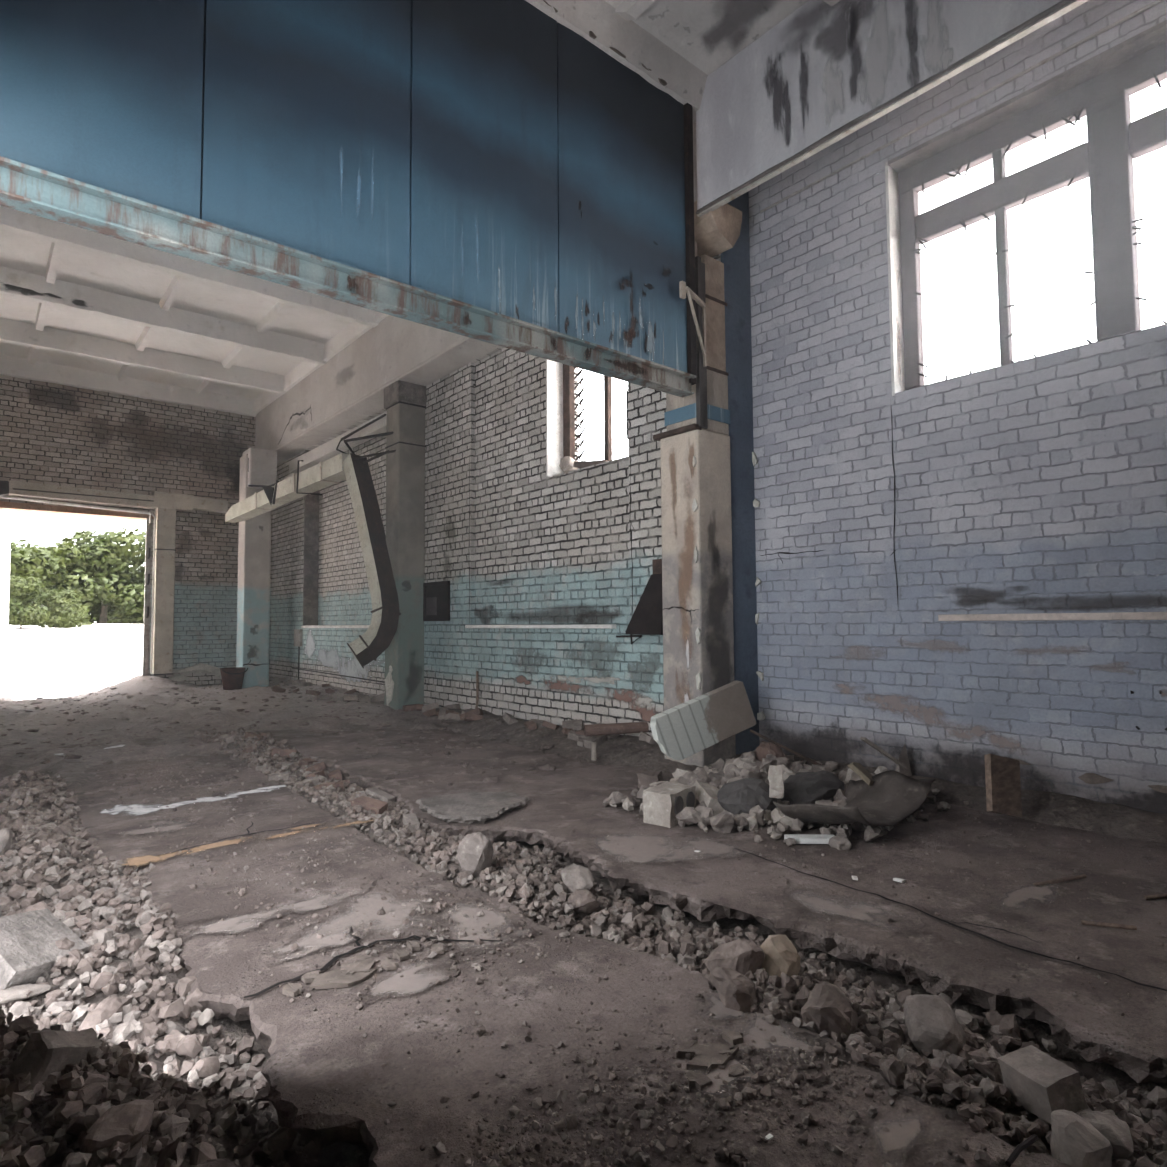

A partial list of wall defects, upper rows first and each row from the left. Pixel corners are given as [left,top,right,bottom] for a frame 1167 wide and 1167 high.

leakage [765,53,808,144]
leakage [822,0,953,121]
peeling [639,298,664,365]
leakage [29,389,80,411]
leakage [93,411,245,493]
leakage [707,523,730,689]
leakage [955,587,1167,610]
crack [734,848,1167,991]